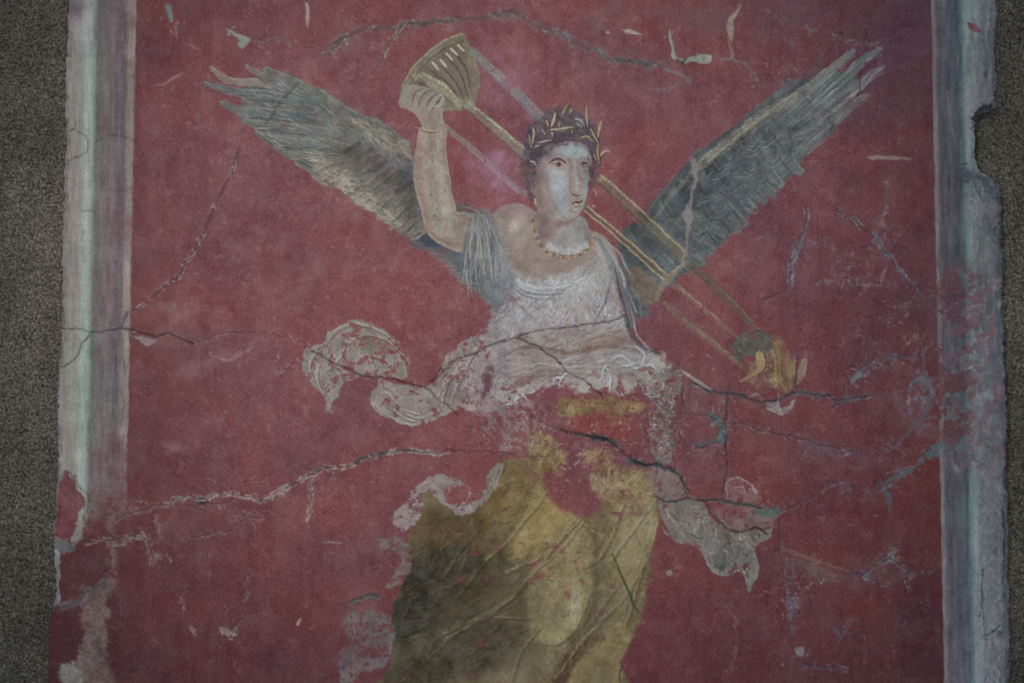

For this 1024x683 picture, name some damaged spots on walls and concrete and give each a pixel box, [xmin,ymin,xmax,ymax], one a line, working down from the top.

crack [320,6,668,74]
peeling [605,28,643,36]
spalling [647,28,713,92]
spalling [968,101,995,136]
crack [59,144,246,373]
crack [242,175,945,683]
peeling [53,469,96,543]